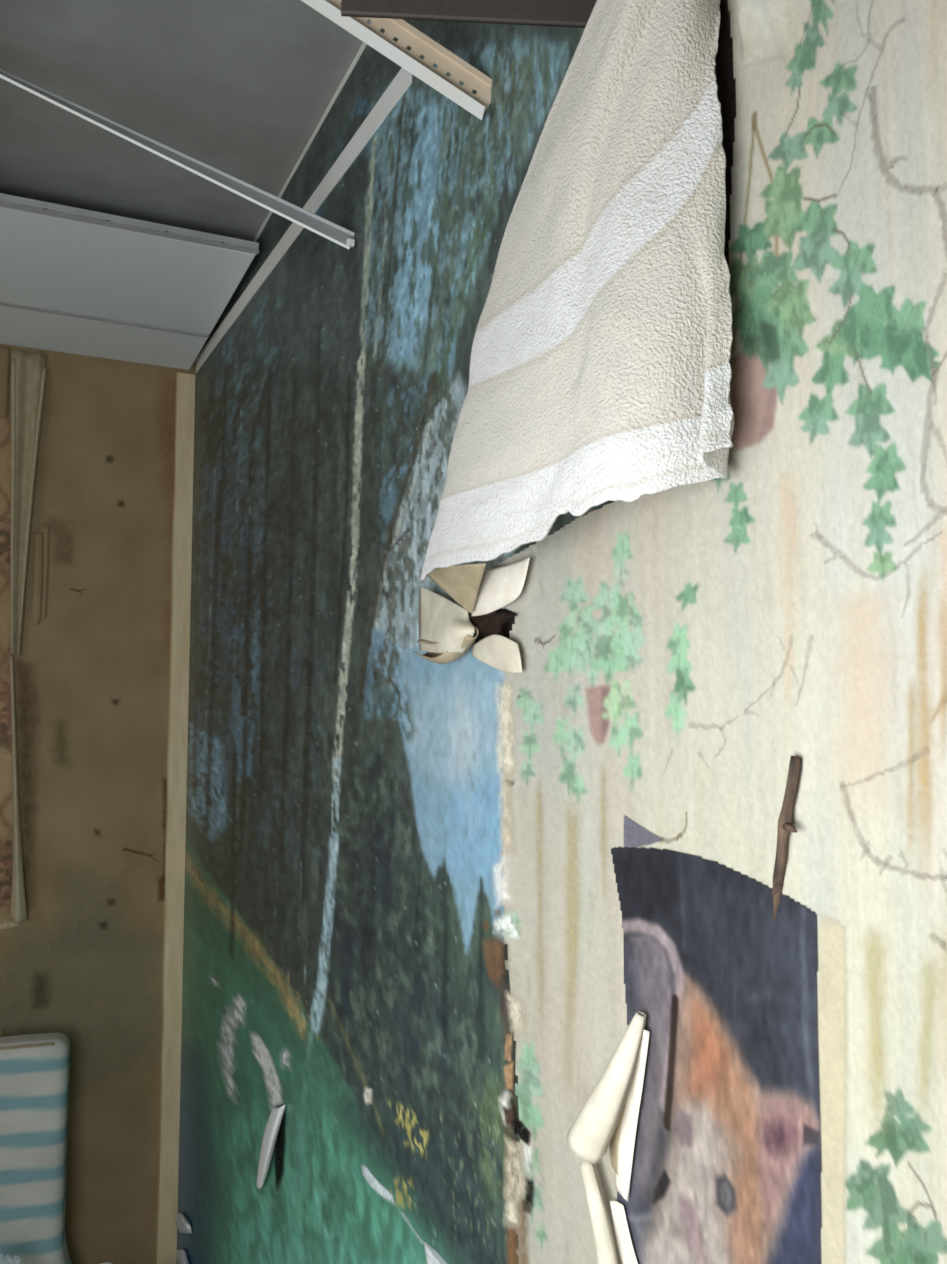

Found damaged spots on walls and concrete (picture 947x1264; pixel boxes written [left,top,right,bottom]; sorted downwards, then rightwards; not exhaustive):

peeling [233,996,245,1022]
peeling [508,995,522,1032]
peeling [500,1096,533,1223]